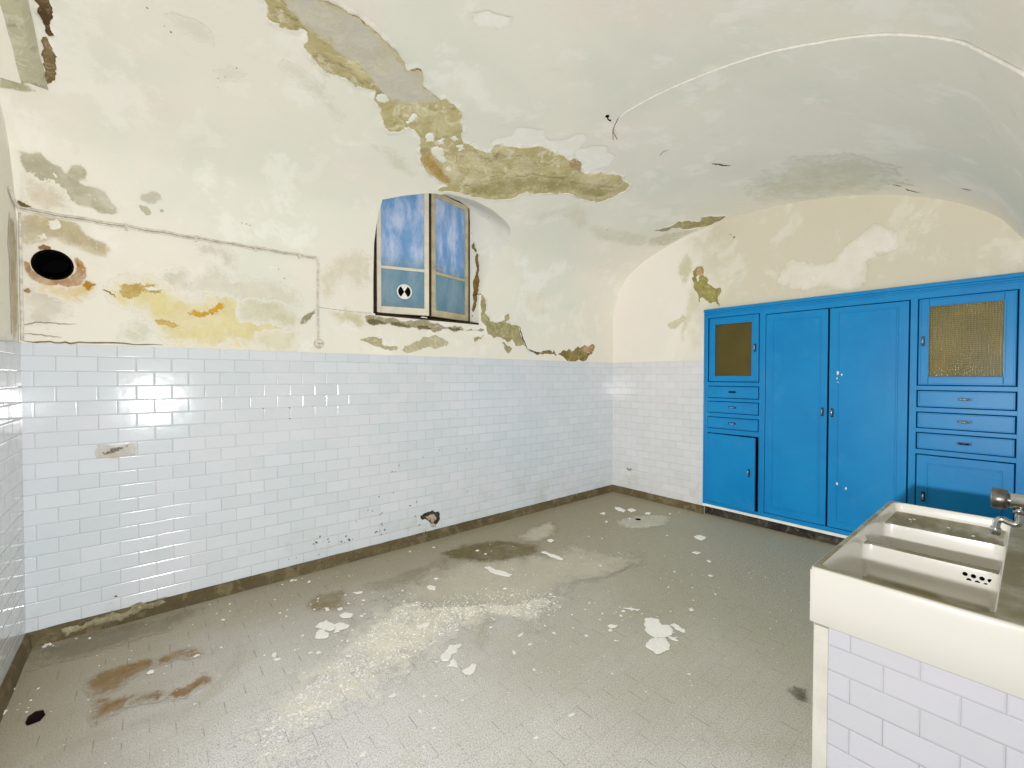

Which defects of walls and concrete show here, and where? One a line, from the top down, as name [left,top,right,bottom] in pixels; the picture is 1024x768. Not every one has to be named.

flaking render [31,0,61,86]
peeling [257,0,633,204]
leakage [743,153,913,204]
peeling [652,214,730,233]
rust [23,256,100,307]
leakage [102,242,304,352]
peeling [690,265,723,308]
peeling [358,293,596,362]
spalling [420,510,440,527]